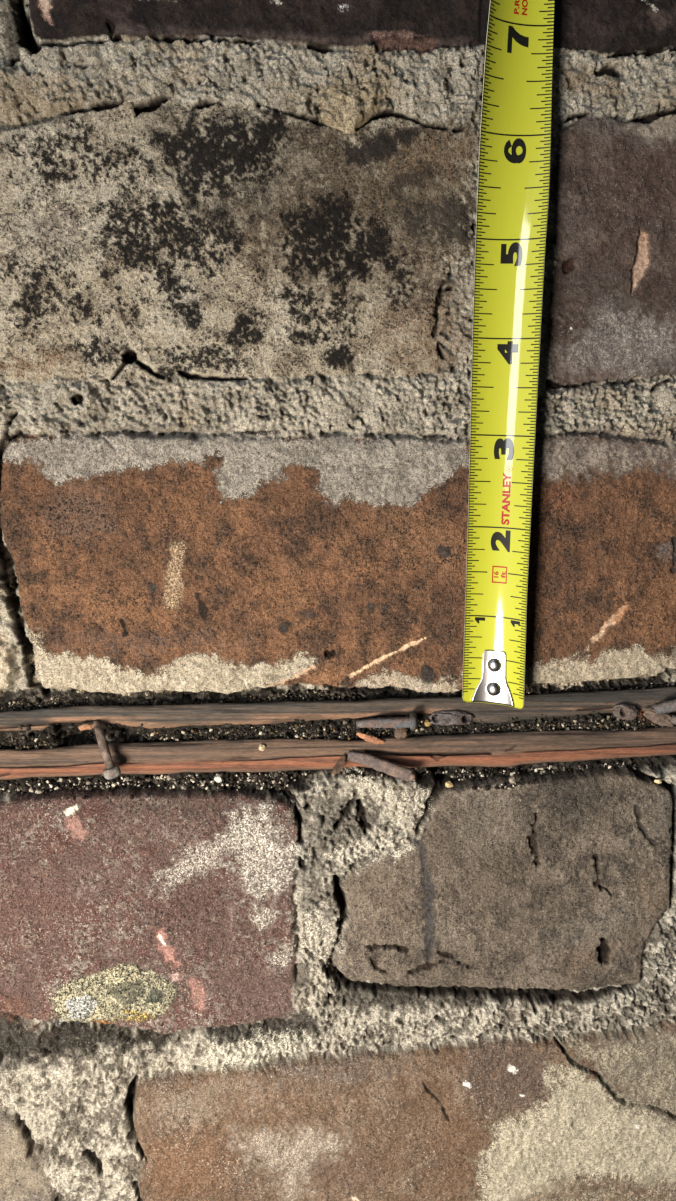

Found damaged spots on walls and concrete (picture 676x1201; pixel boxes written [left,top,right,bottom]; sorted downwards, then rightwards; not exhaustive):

water stain [244,102,300,171]
crack [112,350,248,381]
crack [0,412,51,691]
crack [322,874,676,1122]